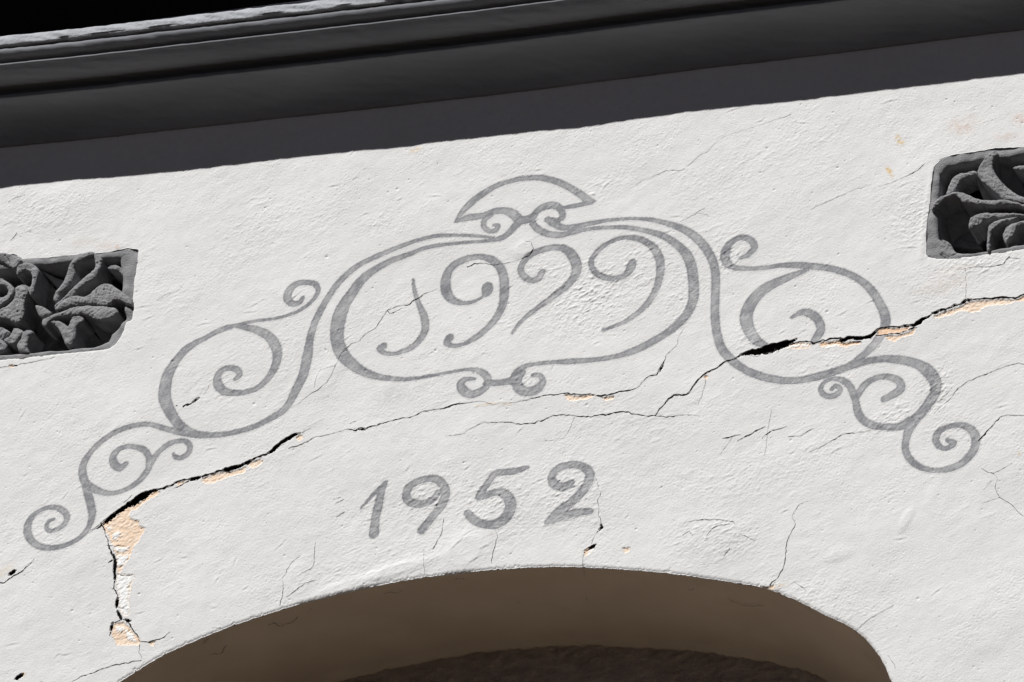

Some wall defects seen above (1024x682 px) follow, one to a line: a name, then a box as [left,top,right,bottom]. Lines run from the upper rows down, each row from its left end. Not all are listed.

spalling [933,296,1024,319]
spalling [785,340,861,350]
spalling [875,326,917,342]
spalling [200,458,263,485]
crack [82,256,1024,676]
spalling [101,491,161,647]